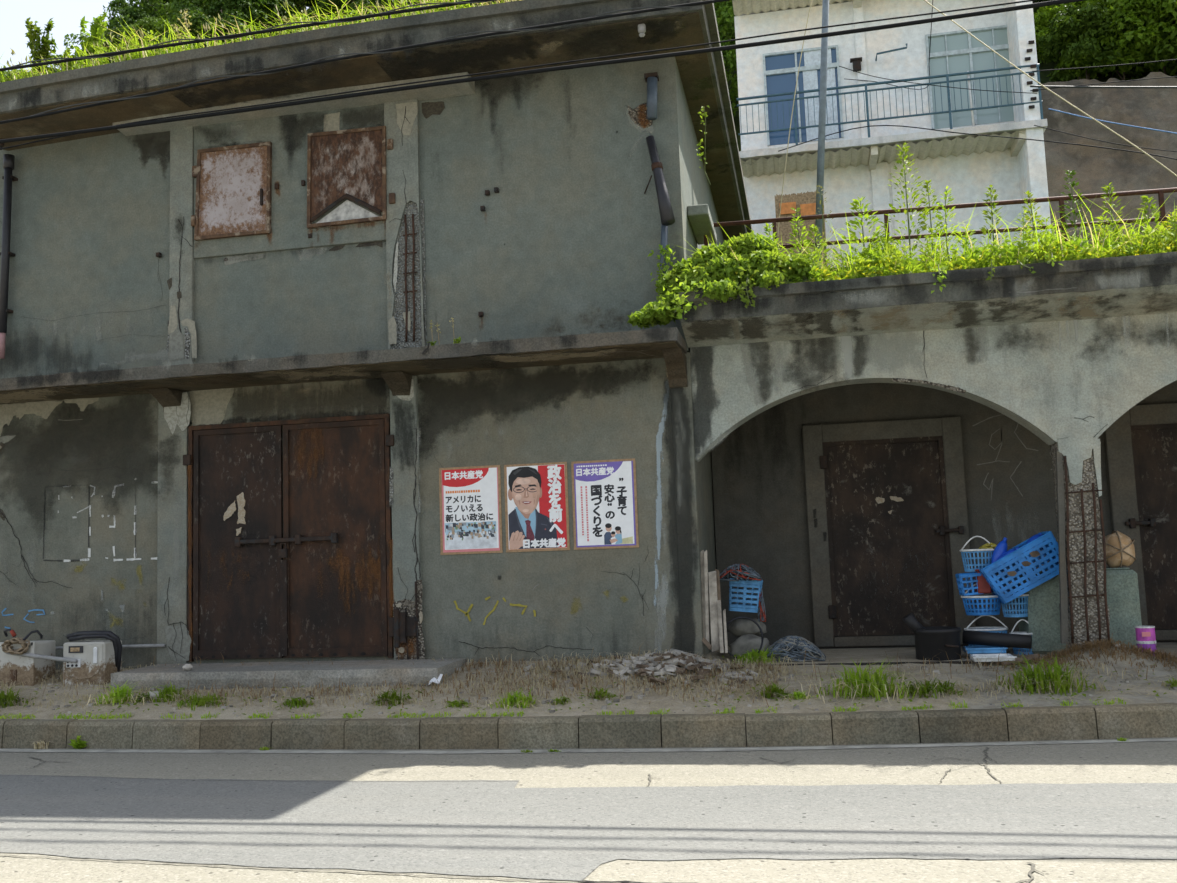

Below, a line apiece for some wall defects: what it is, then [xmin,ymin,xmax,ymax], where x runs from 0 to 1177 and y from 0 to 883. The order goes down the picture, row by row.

spalling [329,199,427,349]
damp [930,259,1125,361]
peeling [0,398,99,452]
damp [0,367,177,518]
crack [0,511,71,588]
spalling [1064,456,1110,643]